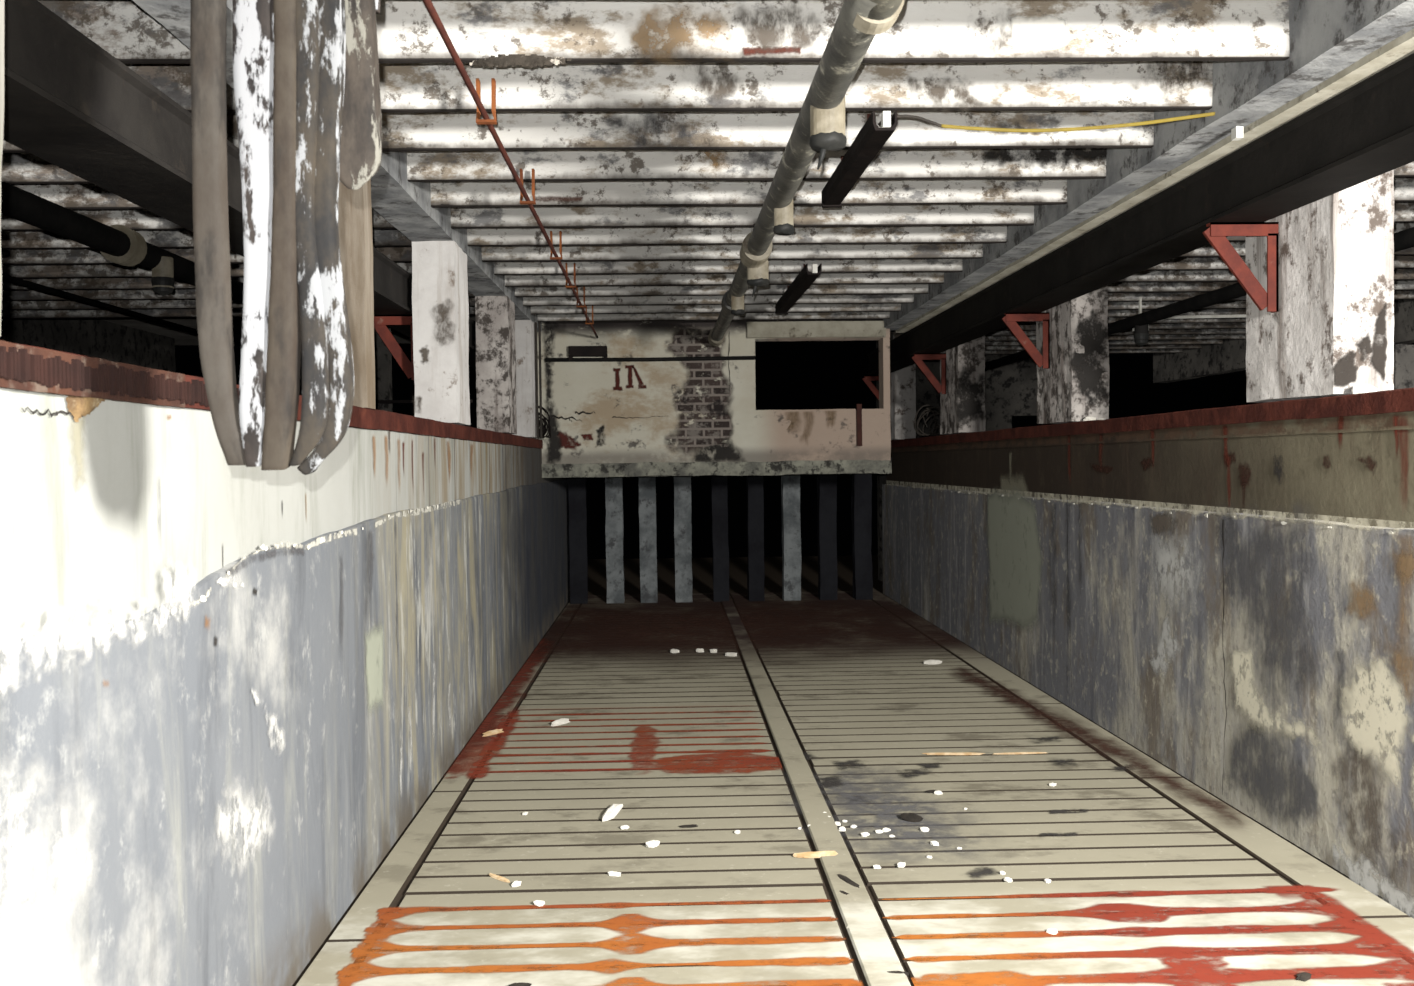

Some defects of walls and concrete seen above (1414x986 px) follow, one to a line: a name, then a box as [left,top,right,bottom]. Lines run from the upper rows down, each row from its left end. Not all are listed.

damp [632,11,723,55]
damp [739,11,818,49]
spalling [666,327,733,453]
corrosion [1224,426,1251,504]
corrosion [1394,416,1408,490]
damp [1231,727,1317,820]